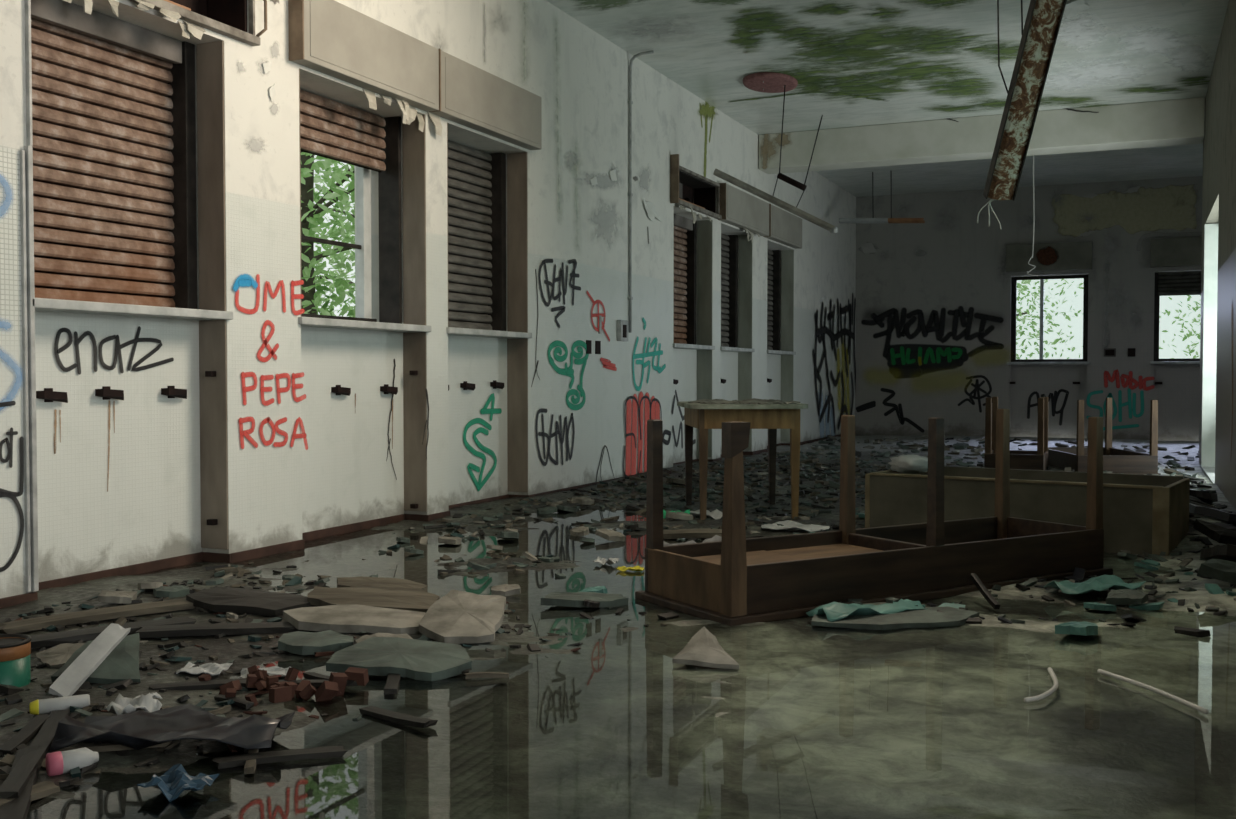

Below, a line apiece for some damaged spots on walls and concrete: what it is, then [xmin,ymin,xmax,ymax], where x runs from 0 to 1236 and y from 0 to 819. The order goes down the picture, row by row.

water stain [574,0,642,11]
water stain [695,0,1019,112]
water stain [1120,76,1210,93]
water stain [1040,97,1107,108]